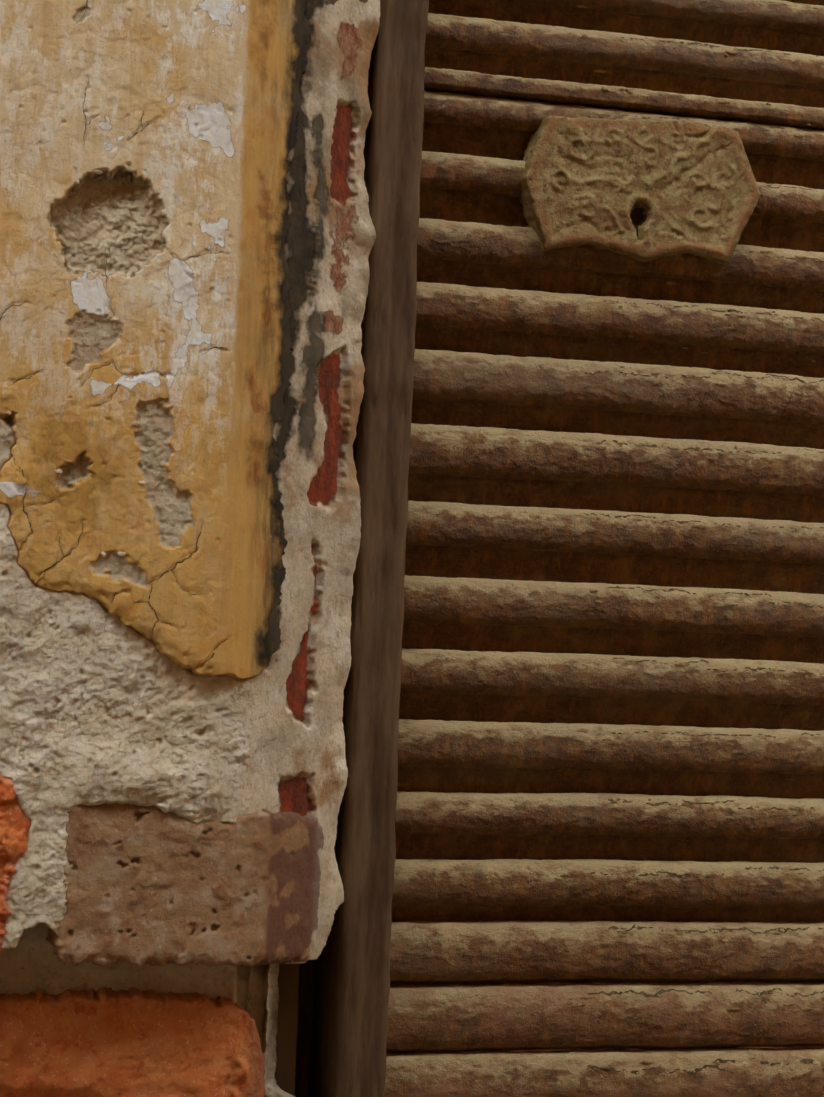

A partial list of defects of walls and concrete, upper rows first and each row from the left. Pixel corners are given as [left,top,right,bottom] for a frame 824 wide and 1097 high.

spalling [337,22,363,80]
spalling [329,103,359,291]
peeling [199,217,229,251]
damp [275,0,330,477]
spalling [322,310,343,334]
spalling [48,166,212,548]
spalling [0,411,15,435]
spalling [307,353,346,506]
peeling [0,481,41,497]
spalling [90,551,149,588]
spalling [286,544,321,722]